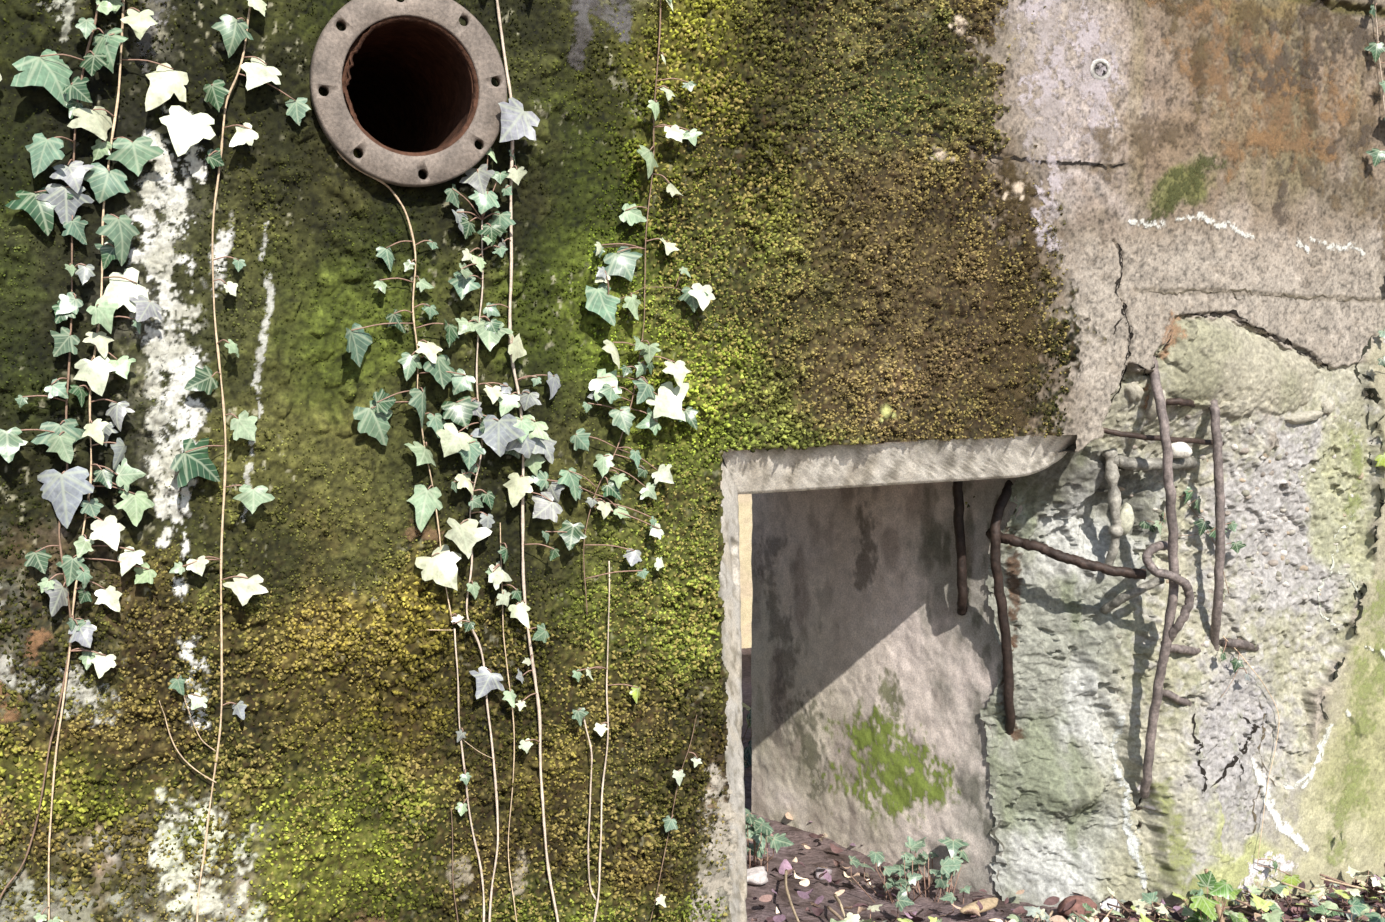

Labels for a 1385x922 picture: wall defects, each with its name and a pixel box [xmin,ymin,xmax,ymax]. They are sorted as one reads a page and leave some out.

corrosion [342,16,479,156]
crack [759,126,1127,184]
damp [1228,0,1385,259]
damp [1128,212,1254,238]
damp [129,131,234,560]
crack [1110,239,1385,719]
damp [173,577,188,596]
corrosion [1006,527,1022,647]
spalling [980,312,1385,912]
damp [179,635,210,729]
damp [879,672,902,721]